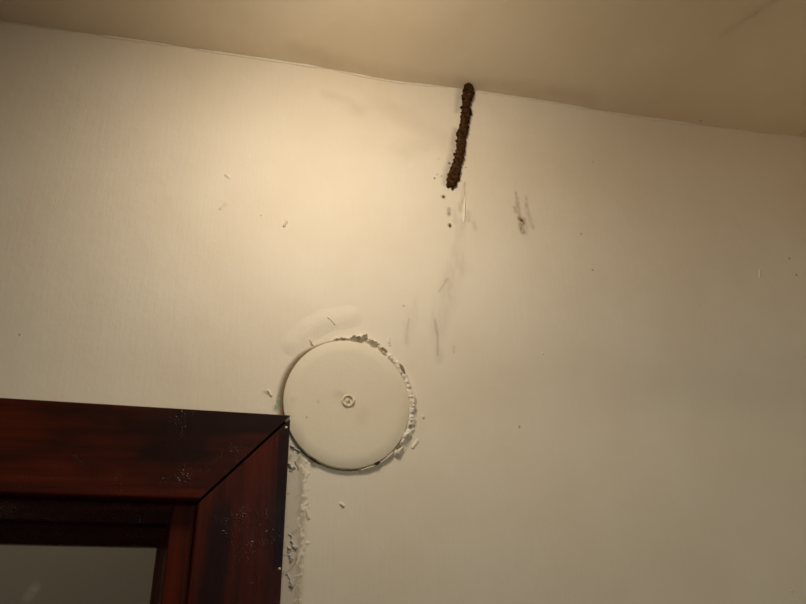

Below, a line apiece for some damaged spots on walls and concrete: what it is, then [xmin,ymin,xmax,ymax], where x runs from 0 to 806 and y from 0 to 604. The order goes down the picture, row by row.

peeling [280,433,312,604]